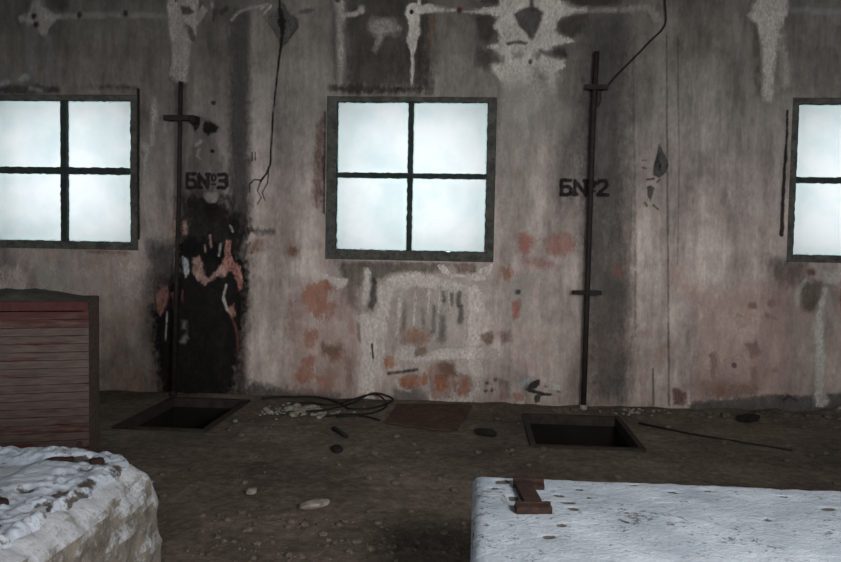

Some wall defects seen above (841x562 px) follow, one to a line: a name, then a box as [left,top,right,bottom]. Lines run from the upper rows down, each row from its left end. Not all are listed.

water stain [168,0,198,76]
water stain [330,0,500,94]
water stain [515,0,543,38]
water stain [750,0,787,101]
peeling [174,227,243,352]
peeling [296,280,347,389]
peeling [384,356,472,399]